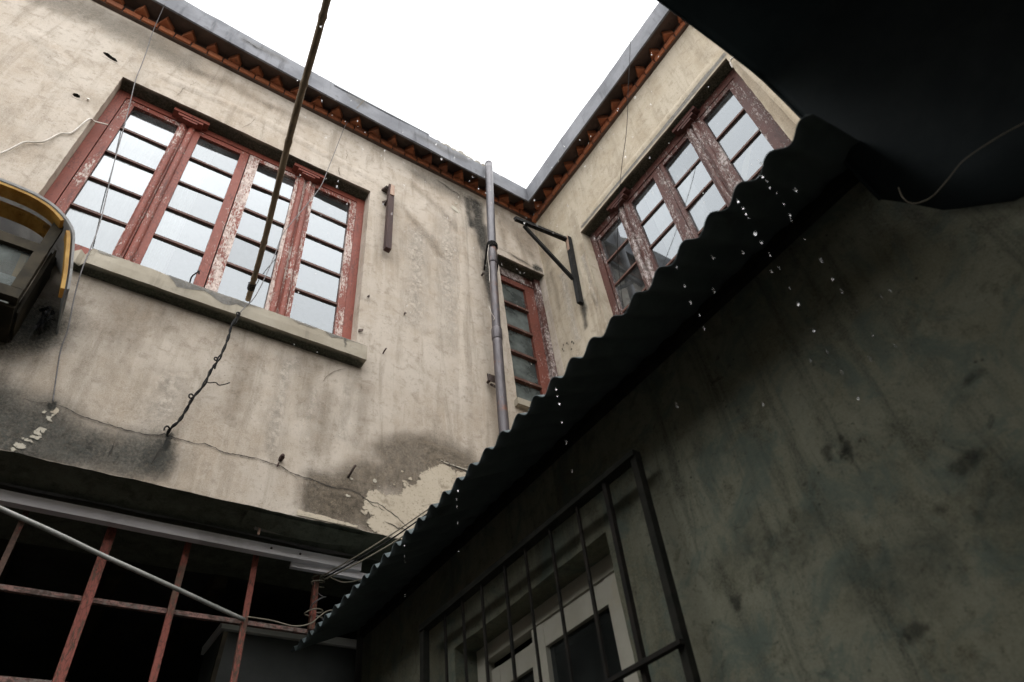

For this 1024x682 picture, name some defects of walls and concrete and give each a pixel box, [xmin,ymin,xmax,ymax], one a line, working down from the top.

spalling [10,401,59,452]
damp [0,387,172,478]
crack [27,399,405,529]
peeling [242,463,466,547]
damp [304,437,471,527]